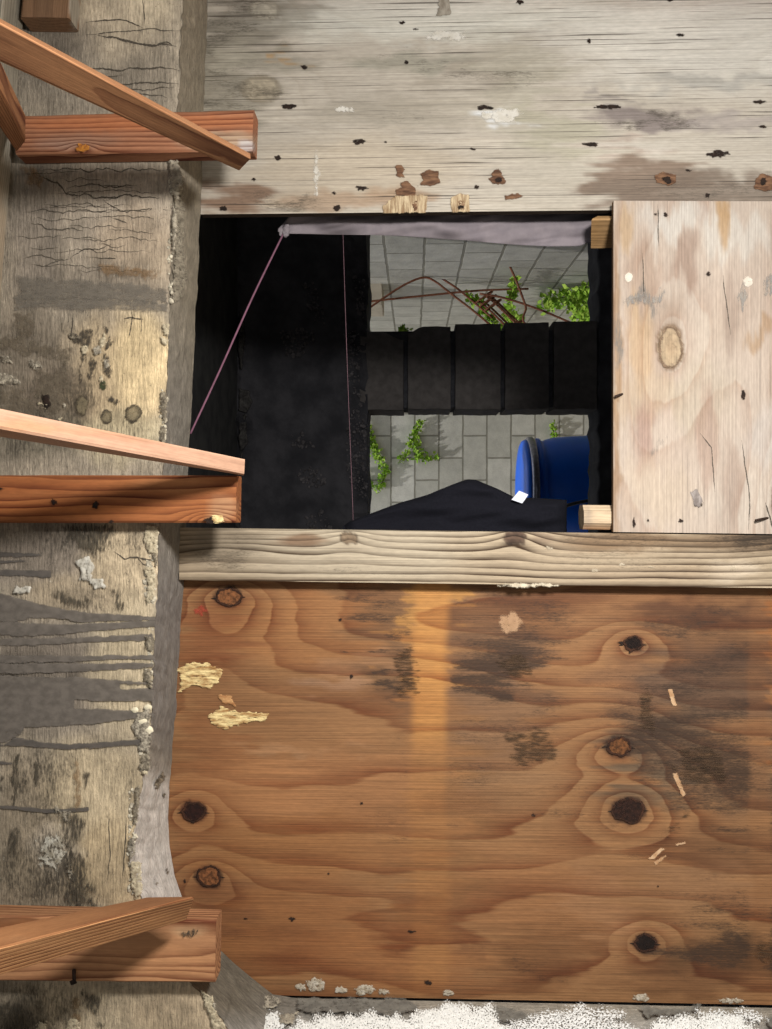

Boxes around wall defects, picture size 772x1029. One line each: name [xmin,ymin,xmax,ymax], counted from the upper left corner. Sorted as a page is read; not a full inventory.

crack [86,0,180,98]
crack [19,167,168,273]
leakage [62,523,118,554]
leakage [394,647,420,697]
leakage [0,588,156,907]
leakage [505,728,557,765]
leakage [297,997,419,1016]
leakage [487,1006,536,1029]